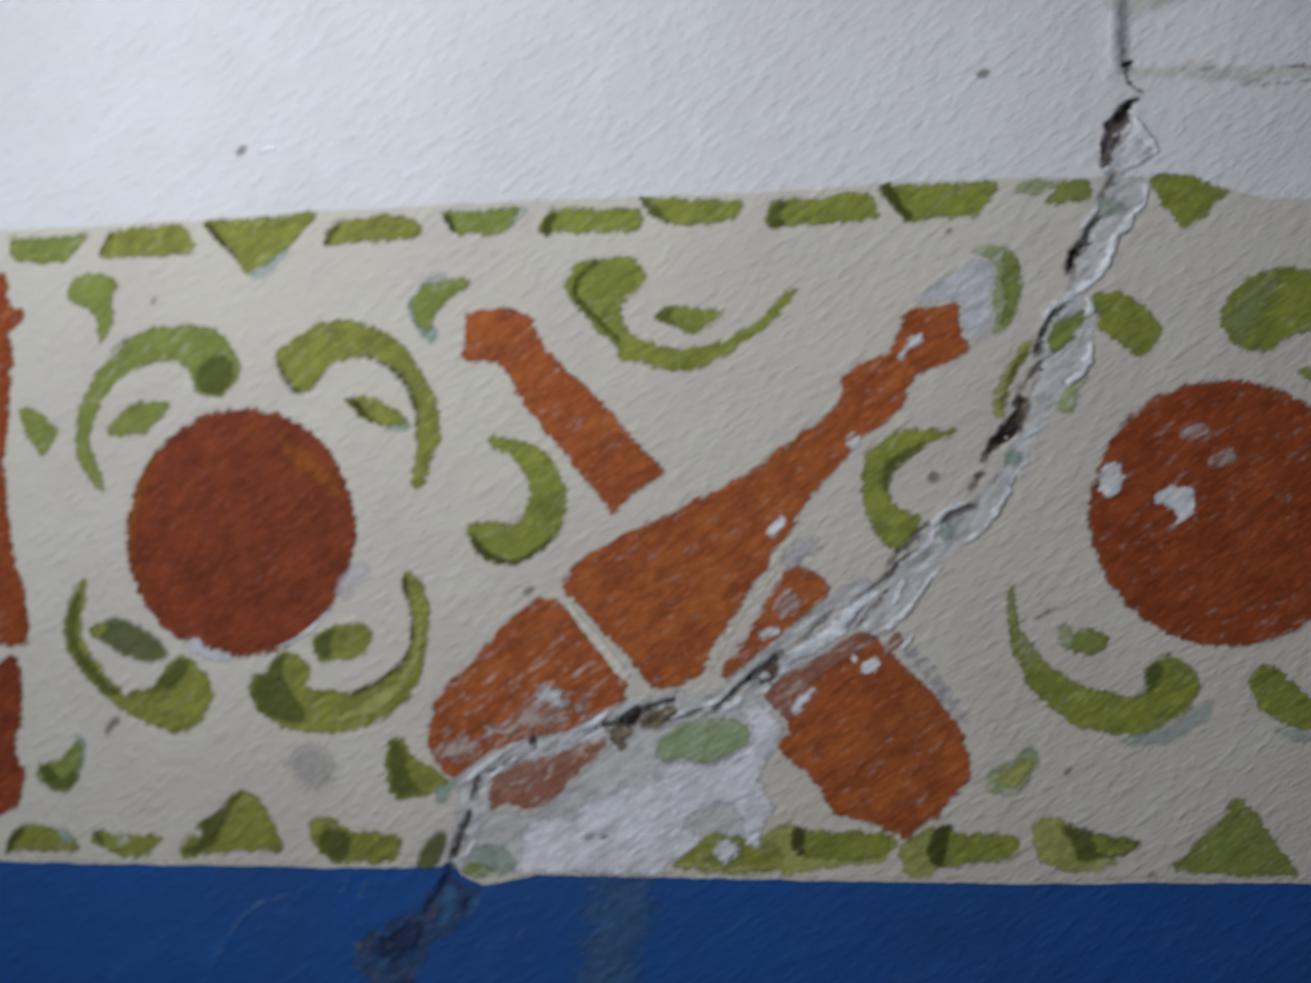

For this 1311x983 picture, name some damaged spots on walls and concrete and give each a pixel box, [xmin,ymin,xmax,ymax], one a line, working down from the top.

crack [446,41,1159,868]
peeling [1097,462,1126,498]
peeling [1154,484,1196,525]
peeling [433,683,588,763]
spalling [466,687,815,876]